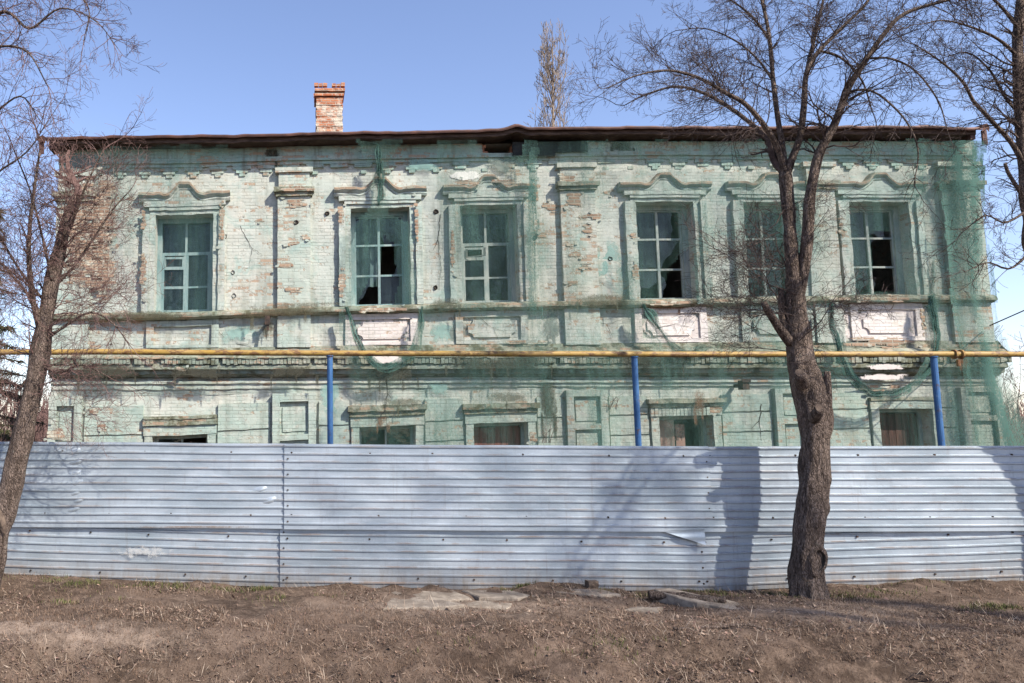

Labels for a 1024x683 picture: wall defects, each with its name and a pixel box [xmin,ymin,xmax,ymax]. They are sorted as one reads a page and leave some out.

spalling [56,167,135,301]
spalling [279,183,319,208]
spalling [338,268,346,301]
spalling [453,173,608,286]